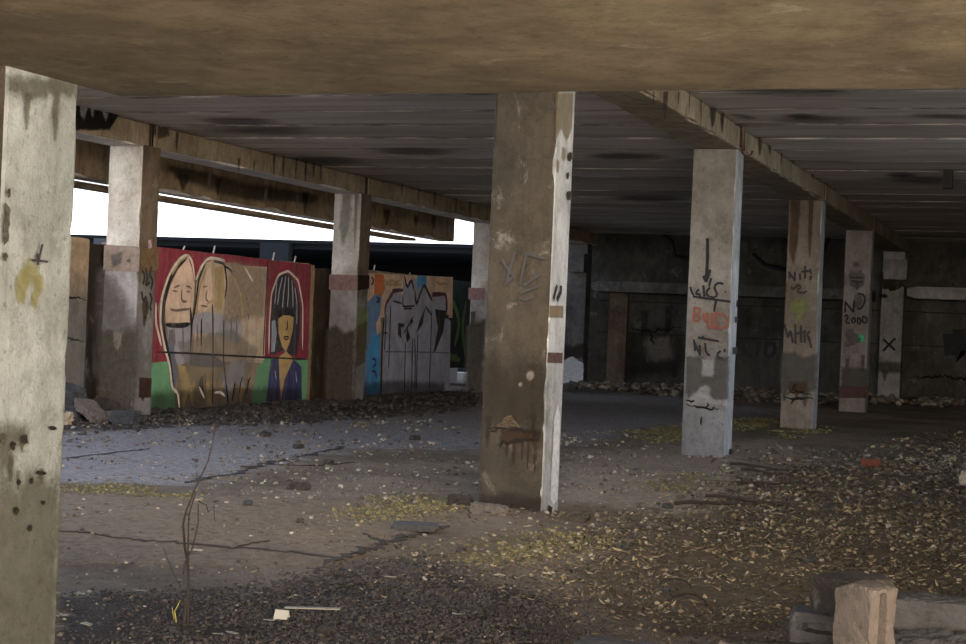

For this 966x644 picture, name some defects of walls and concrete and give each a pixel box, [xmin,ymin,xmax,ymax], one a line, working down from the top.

water stain [170,167,317,212]
spalling [3,188,11,261]
spalling [1,433,29,451]